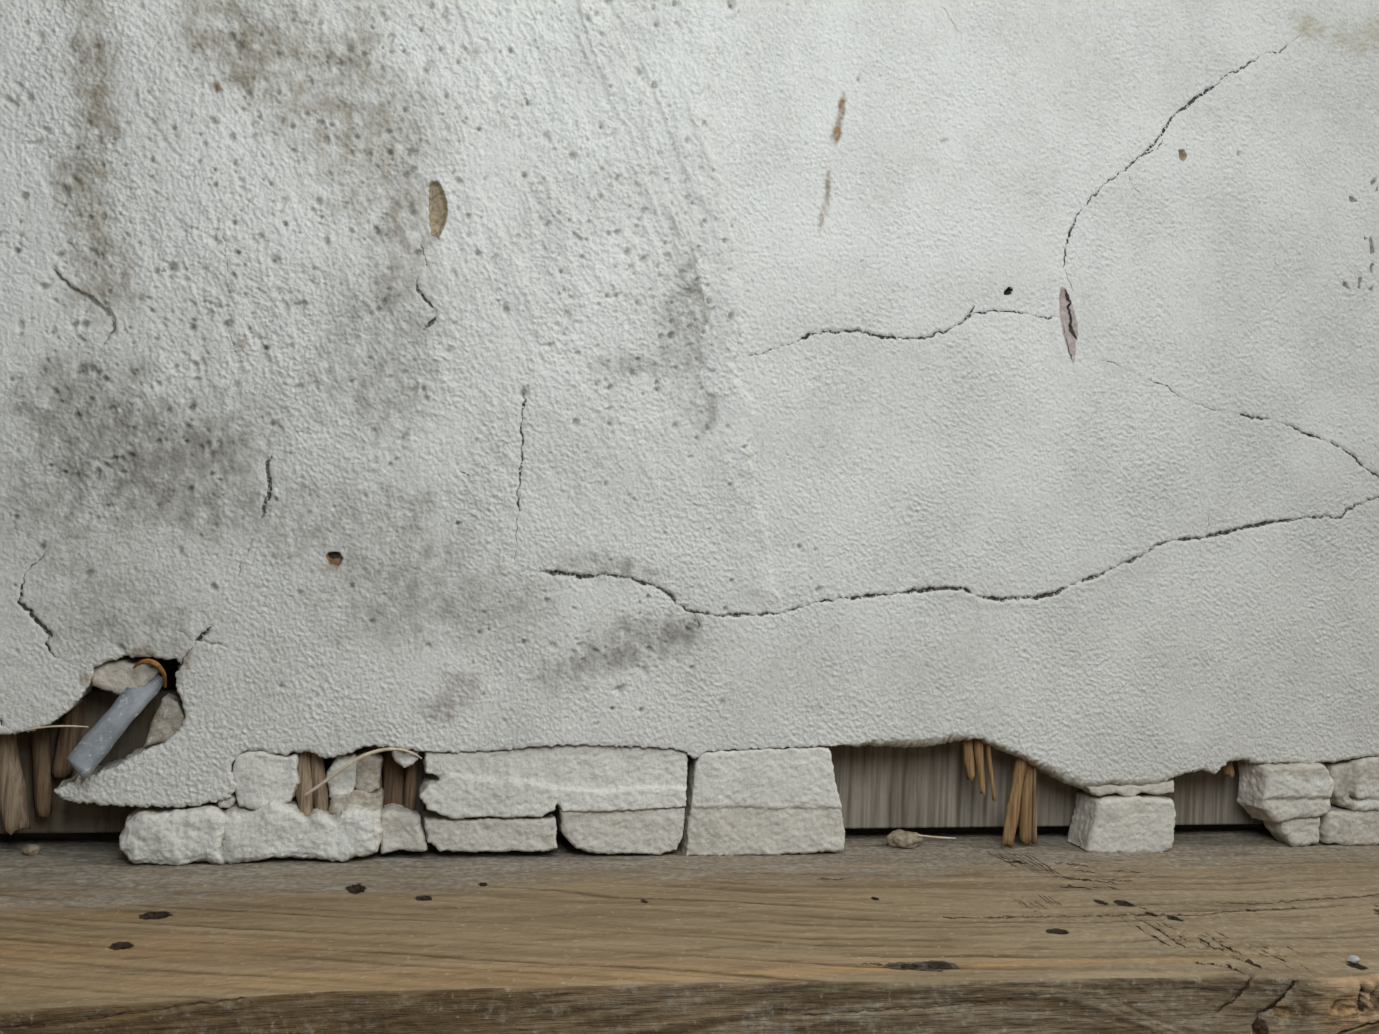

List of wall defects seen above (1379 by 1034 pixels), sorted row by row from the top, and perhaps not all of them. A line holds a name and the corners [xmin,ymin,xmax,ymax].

crack [749,26,1309,356]
flaking render [1051,287,1078,363]
crack [17,551,92,671]
crack [514,360,1379,634]